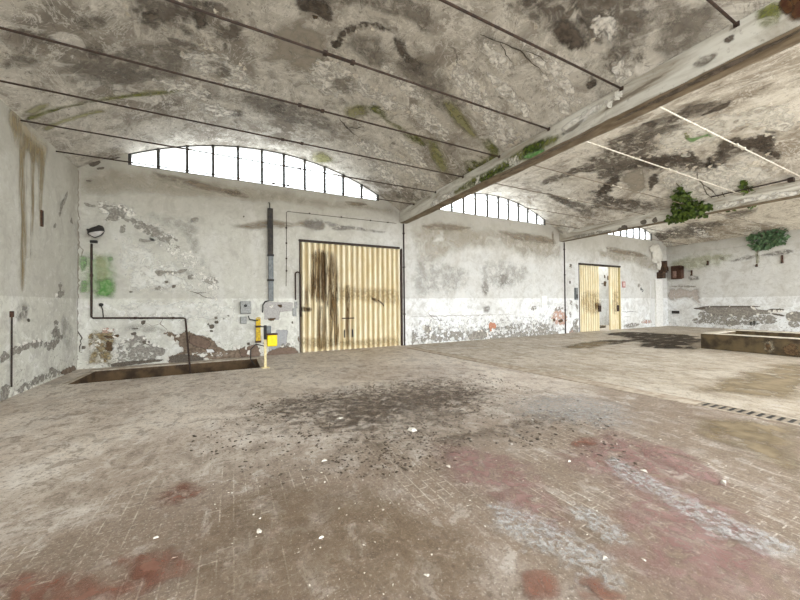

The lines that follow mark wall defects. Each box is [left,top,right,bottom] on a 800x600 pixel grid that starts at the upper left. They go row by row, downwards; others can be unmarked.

leakage [216,25,241,39]
leakage [331,22,389,65]
leakage [297,0,434,31]
crack [480,34,548,73]
leakage [522,0,714,86]
leakage [395,26,800,230]
peeling [84,201,219,301]
peeling [412,300,579,345]
flaking render [692,305,800,327]
spalling [0,320,300,401]